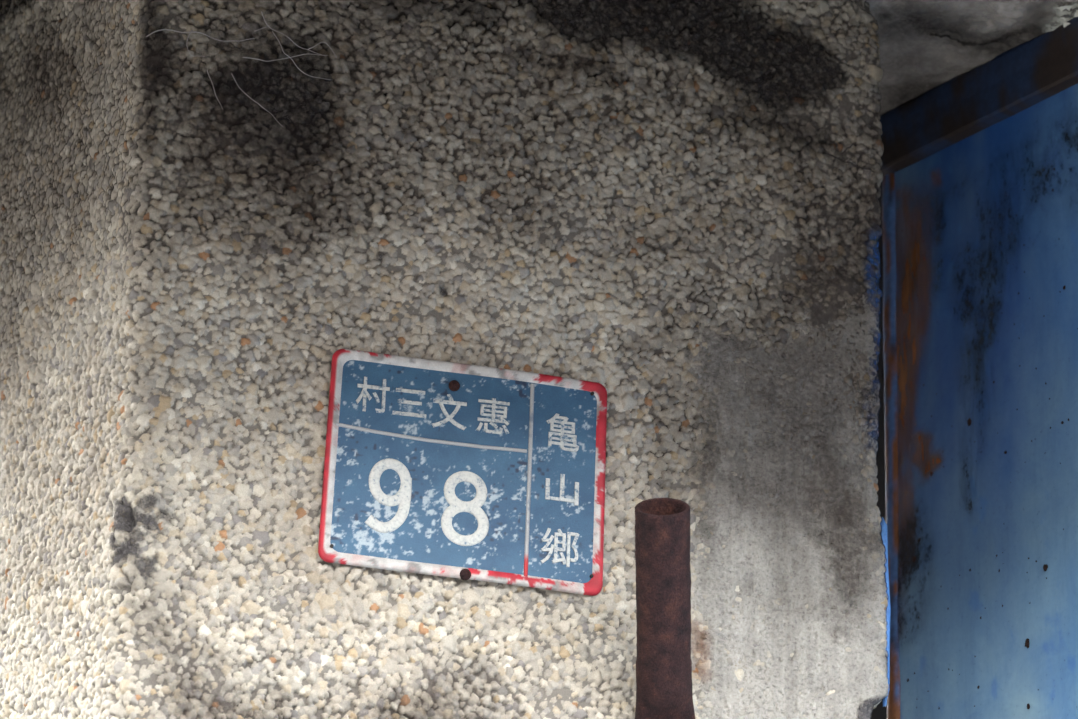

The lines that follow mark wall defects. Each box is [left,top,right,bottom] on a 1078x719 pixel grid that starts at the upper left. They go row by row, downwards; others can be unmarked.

damp [0,0,32,23]
damp [0,20,115,247]
damp [142,0,1041,260]
corrosion [895,196,942,479]
spalling [858,698,882,719]